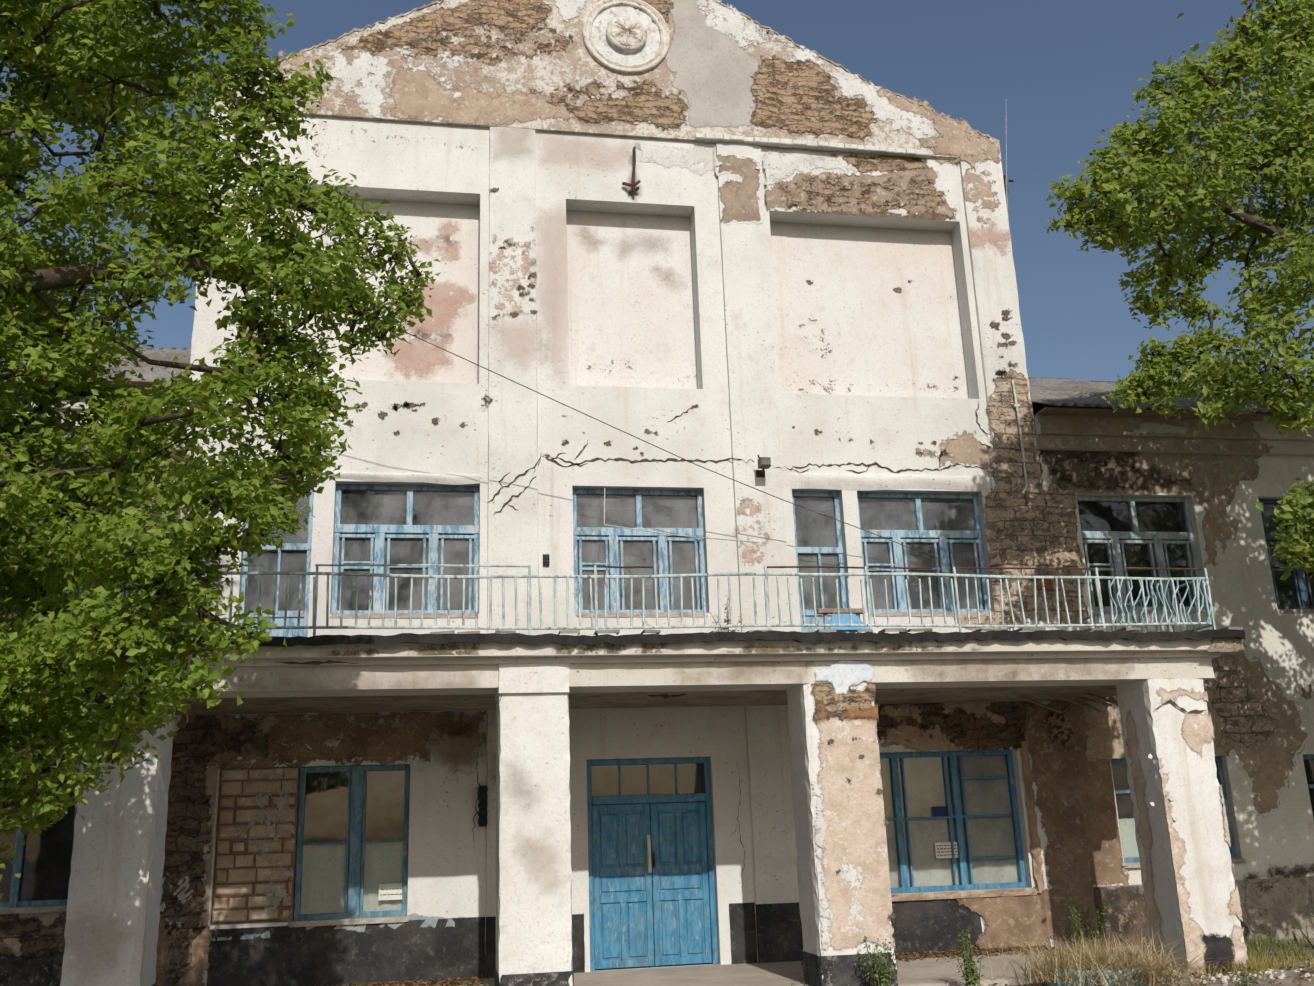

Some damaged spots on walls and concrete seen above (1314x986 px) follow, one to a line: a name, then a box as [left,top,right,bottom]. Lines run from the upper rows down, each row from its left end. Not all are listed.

flaking render [276,0,1011,252]
crack [487,442,993,516]
spalling [915,309,1273,630]
spalling [0,911,67,961]
spalling [155,710,486,986]
peeling [811,637,1314,973]